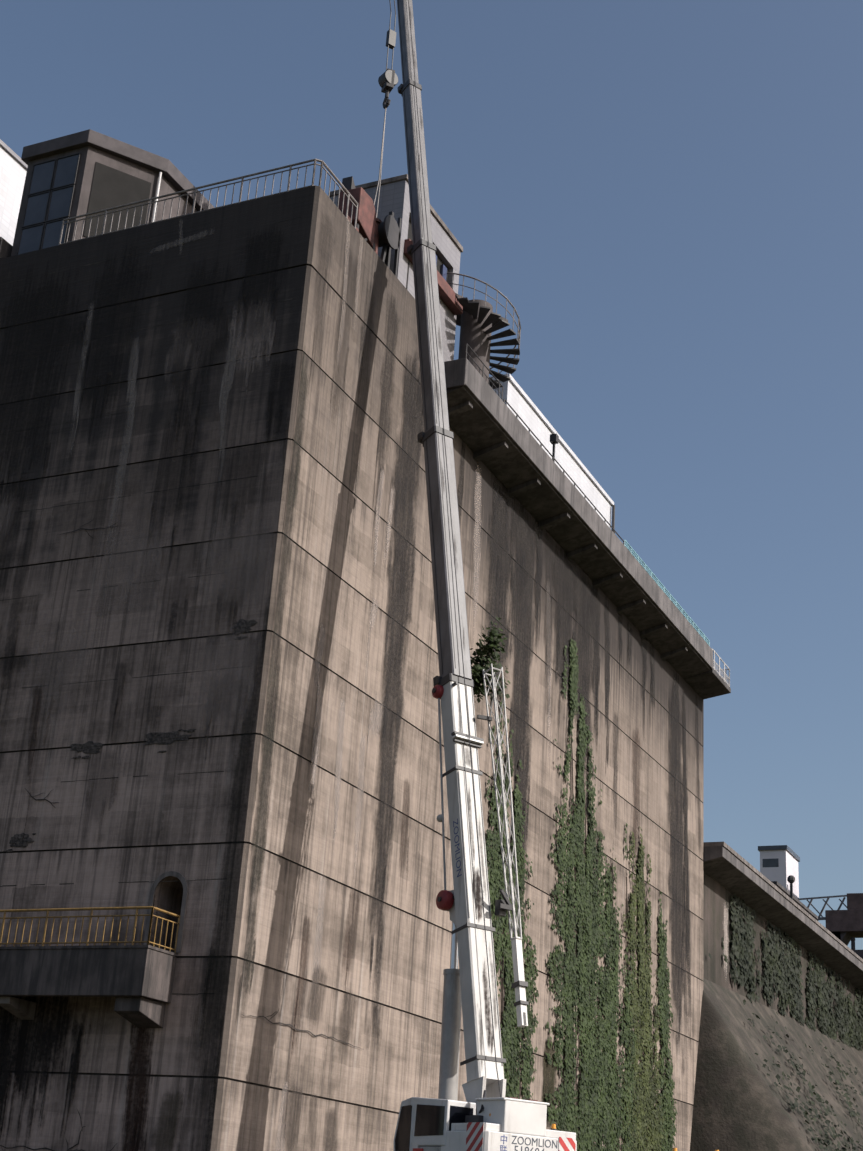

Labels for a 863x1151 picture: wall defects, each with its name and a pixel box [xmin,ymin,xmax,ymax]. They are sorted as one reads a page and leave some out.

water stain [369,304,424,984]
water stain [485,472,655,889]
spalling [70,741,104,759]
spalling [144,729,196,753]
spalling [6,833,36,852]
water stain [668,672,701,1068]
water stain [61,1026,83,1128]